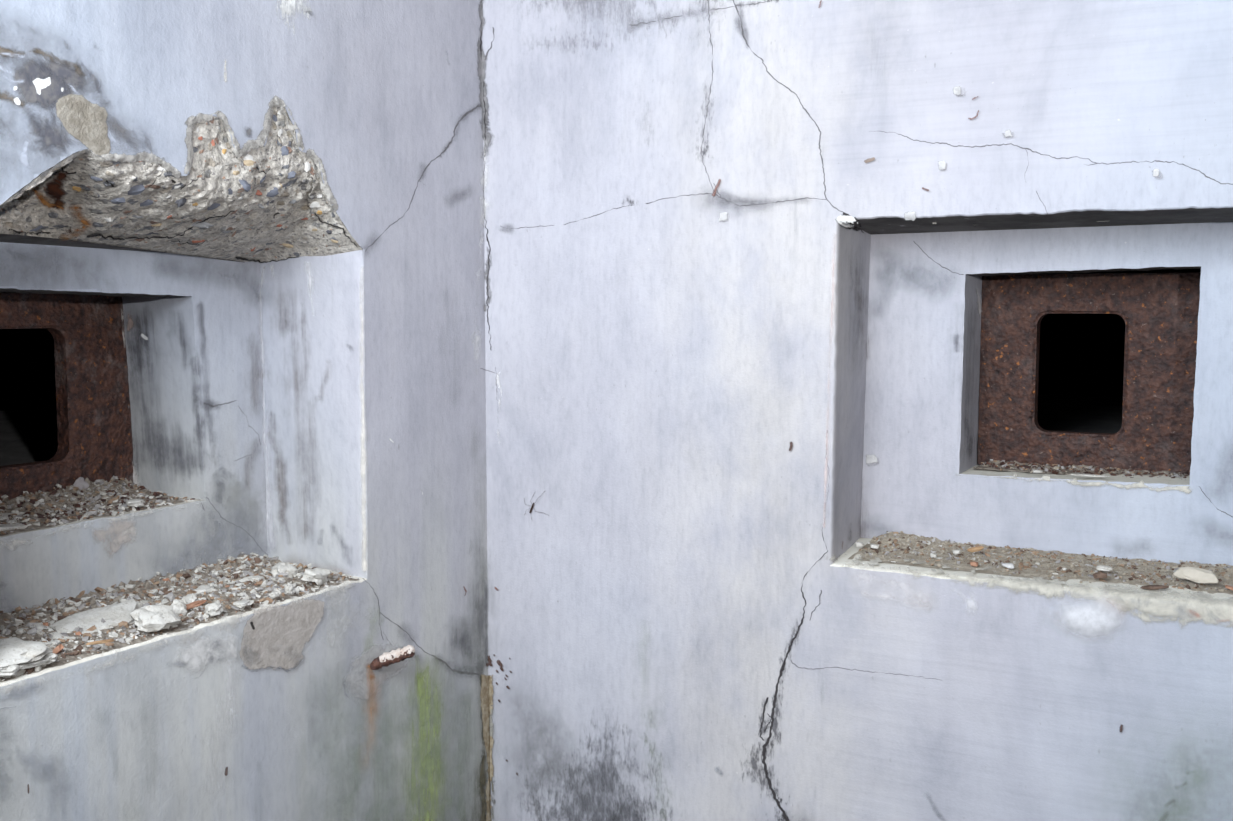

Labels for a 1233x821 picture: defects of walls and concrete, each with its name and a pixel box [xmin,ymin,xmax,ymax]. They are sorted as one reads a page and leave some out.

water stain [0,40,100,166]
spalling [0,94,362,263]
crack [366,0,859,401]
crack [881,131,1233,185]
flaking render [178,599,325,671]
crack [369,584,480,676]
crack [742,533,938,821]
water stain [533,734,642,821]